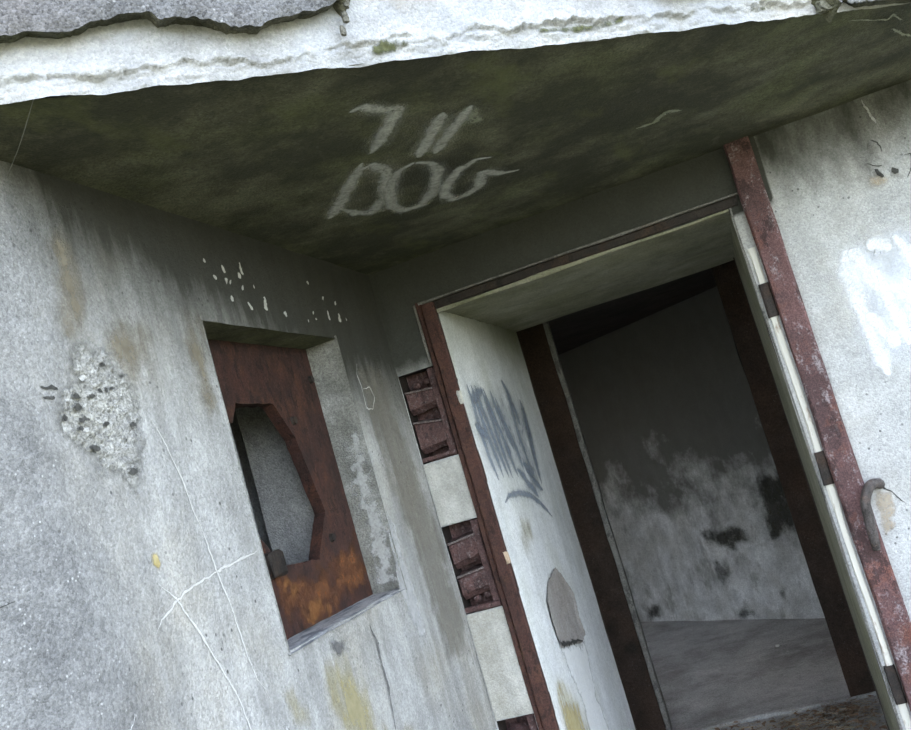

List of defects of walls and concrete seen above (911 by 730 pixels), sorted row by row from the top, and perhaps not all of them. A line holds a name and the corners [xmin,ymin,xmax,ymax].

spalling [0,0,911,105]
spalling [41,342,145,493]
rust [275,549,366,623]
spalling [547,567,586,648]